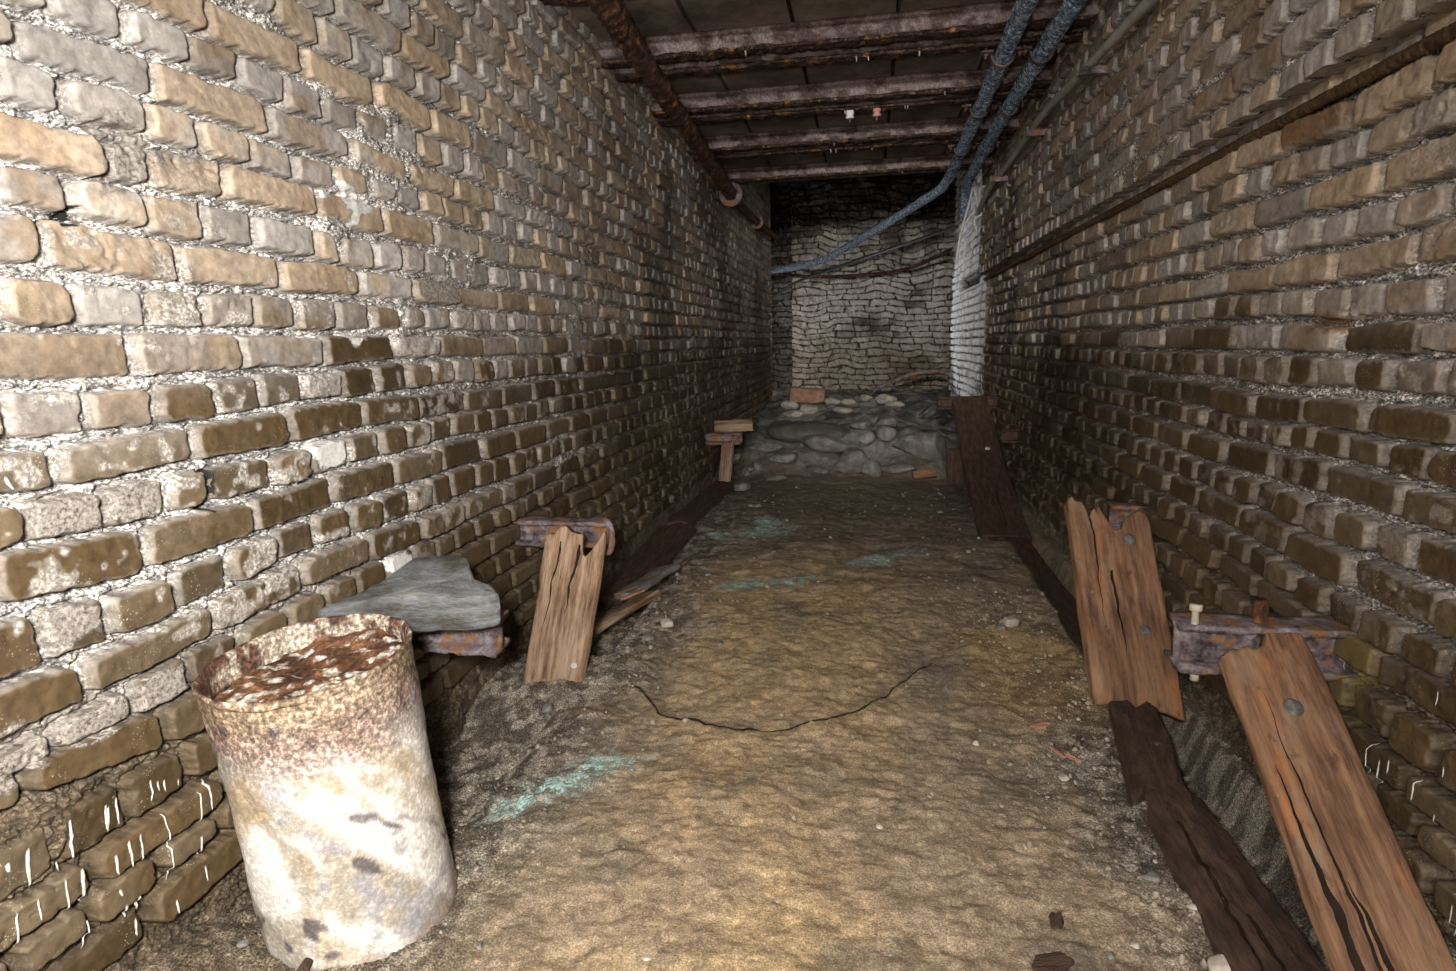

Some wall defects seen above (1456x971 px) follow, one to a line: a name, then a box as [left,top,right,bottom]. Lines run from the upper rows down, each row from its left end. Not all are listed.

crack [633,663,932,732]
water stain [6,849,42,920]
water stain [56,820,86,910]
water stain [105,798,119,830]
water stain [115,835,144,935]
water stain [150,780,179,879]
water stain [197,780,213,880]